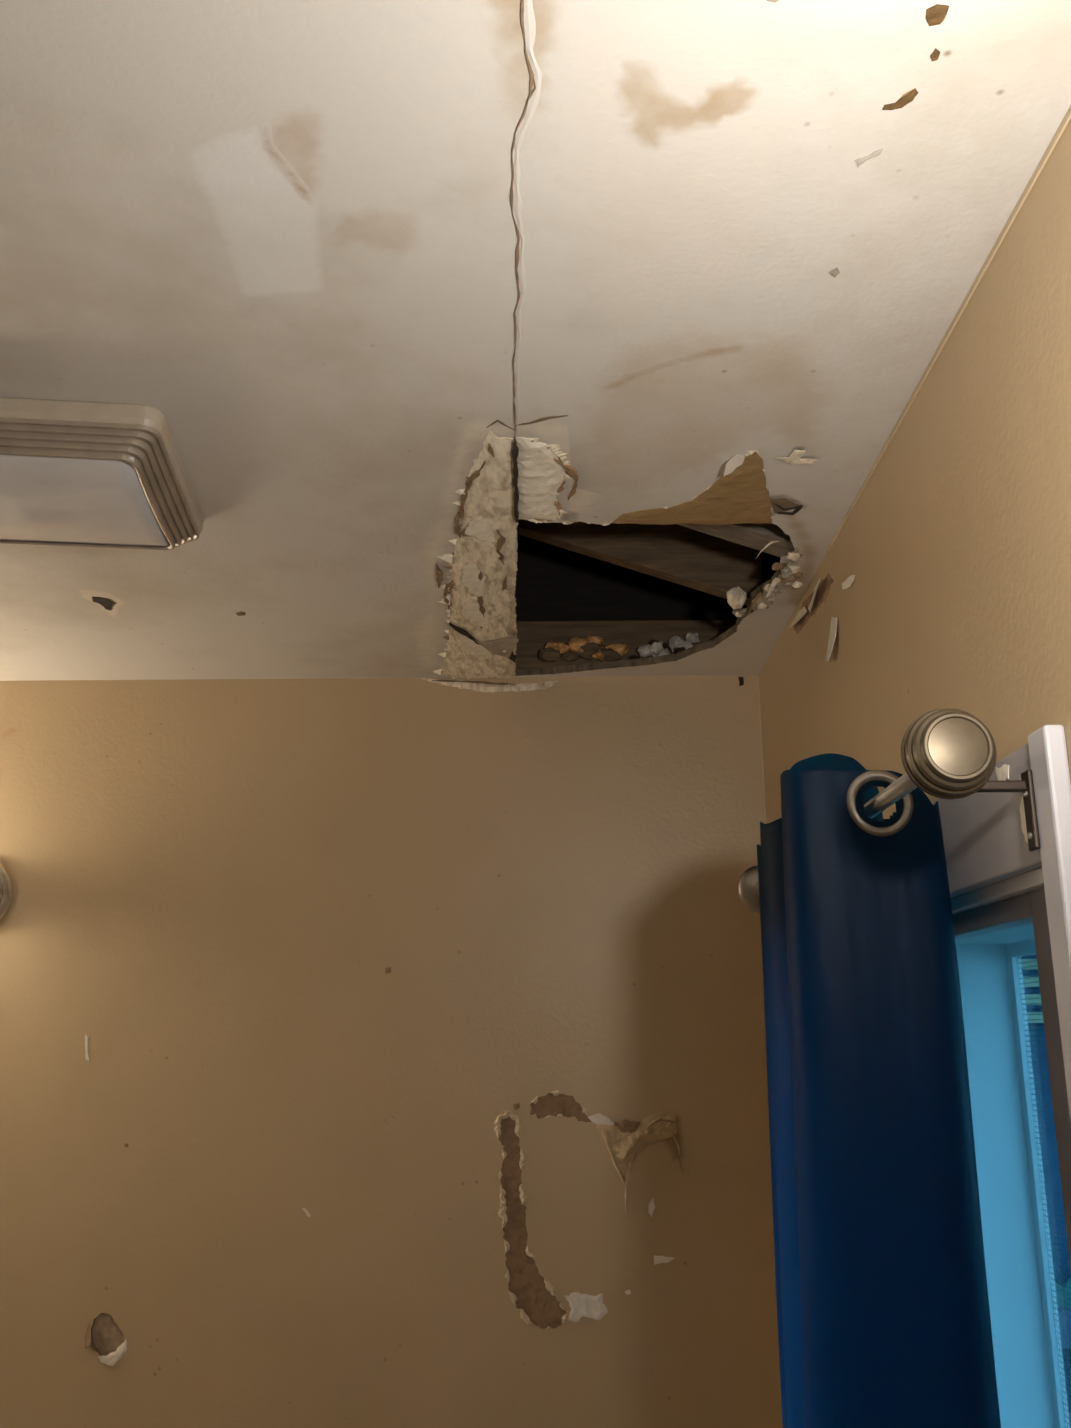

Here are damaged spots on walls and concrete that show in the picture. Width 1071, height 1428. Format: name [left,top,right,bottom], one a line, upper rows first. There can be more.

peeling [926,4,949,26]
peeling [882,88,918,110]
crack [486,0,568,523]
water stain [470,0,856,503]
spalling [771,498,803,515]
flaking render [407,415,607,679]
peeling [76,588,128,618]
peeling [789,573,855,661]
peeling [588,1113,614,1126]
peeling [565,1292,608,1323]
spalling [84,1313,127,1367]